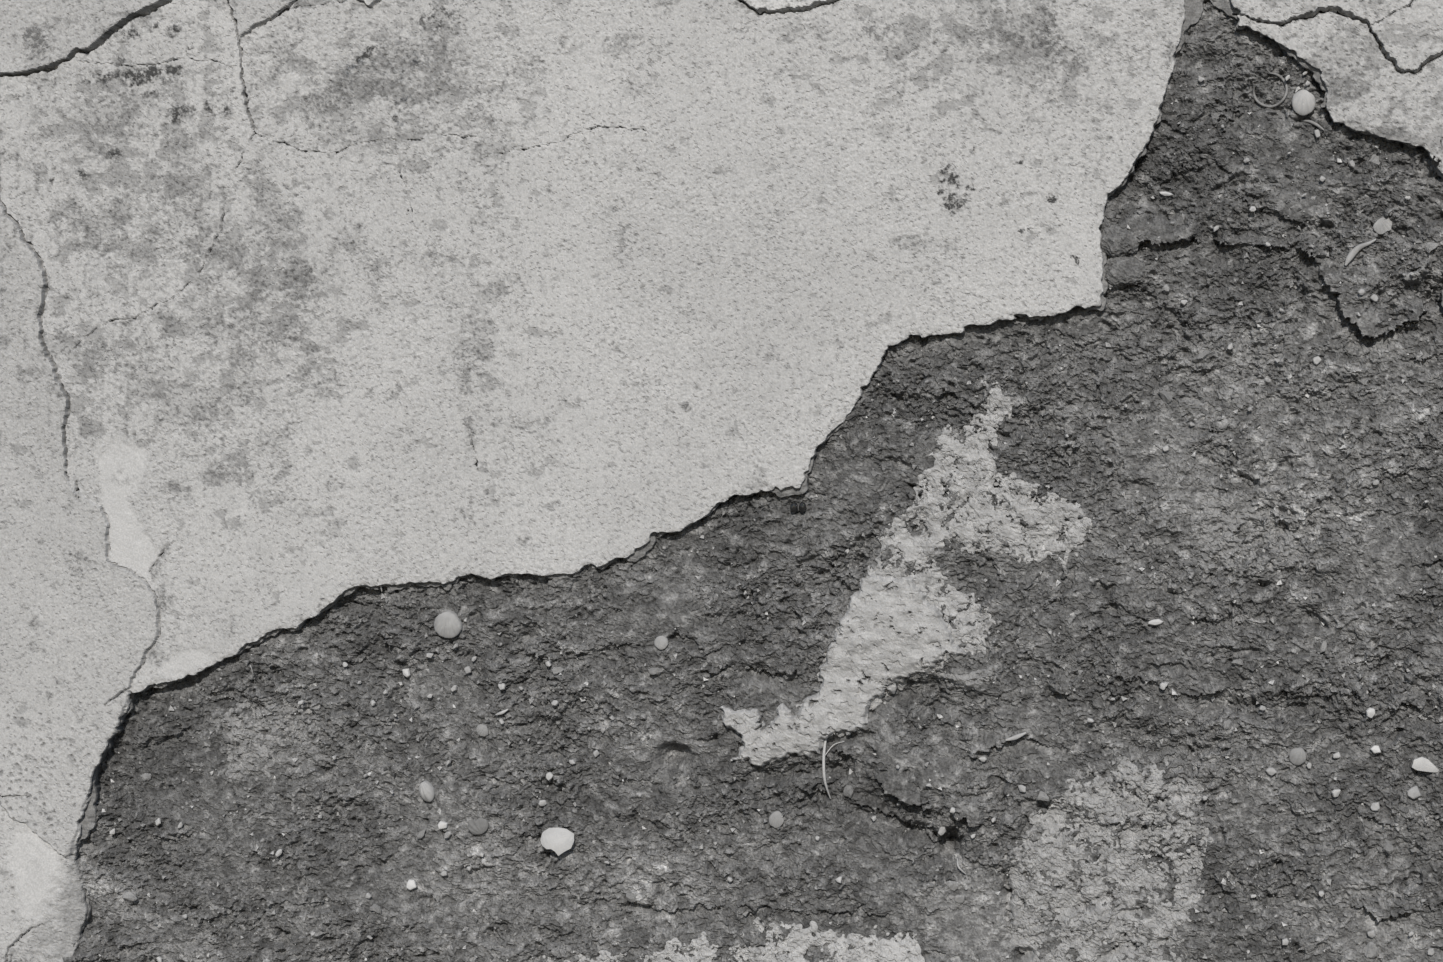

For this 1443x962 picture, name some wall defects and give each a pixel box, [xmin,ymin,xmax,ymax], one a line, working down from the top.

crack [1233,0,1439,74]
flaking render [1194,489,1305,576]
flaking render [220,697,321,784]
peeling [1407,786,1421,799]
spalling [1036,909,1065,960]
spalling [1096,938,1119,951]